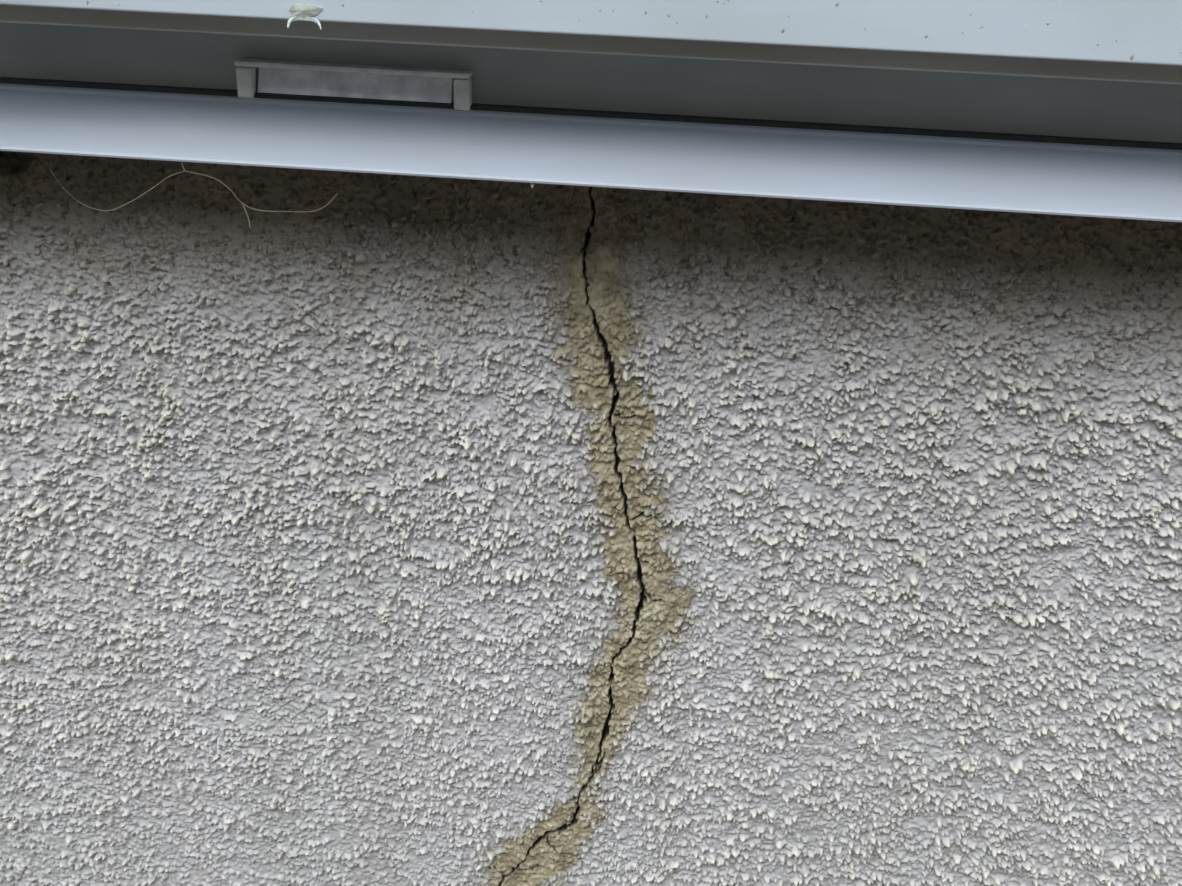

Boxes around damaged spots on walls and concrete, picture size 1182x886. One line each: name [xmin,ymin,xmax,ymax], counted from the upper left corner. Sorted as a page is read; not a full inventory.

crack [495,187,662,886]